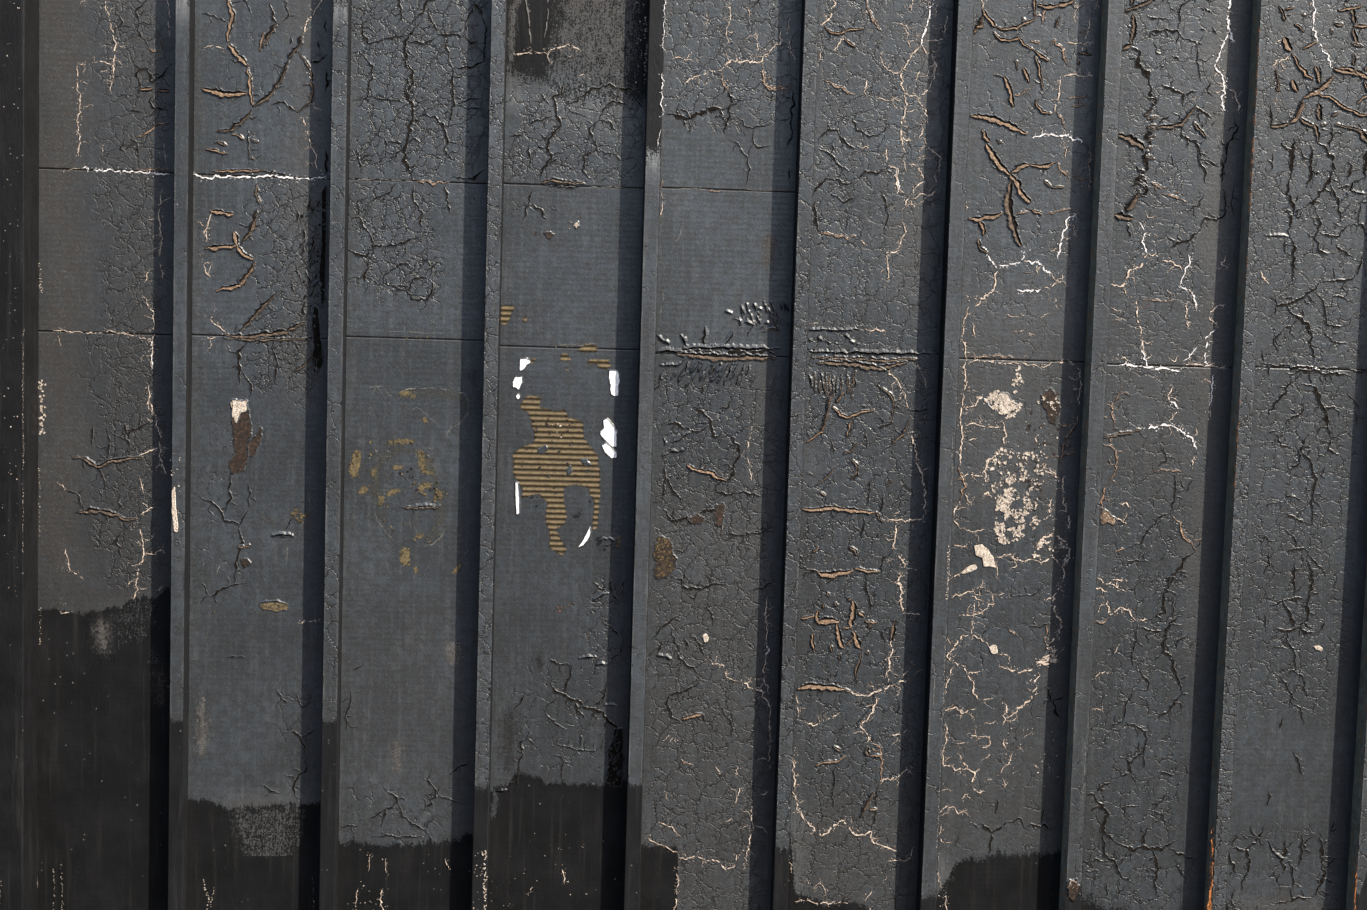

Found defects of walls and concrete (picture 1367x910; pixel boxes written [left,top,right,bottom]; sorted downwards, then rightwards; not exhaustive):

crack [72,0,171,161]
crack [202,0,949,302]
crack [58,189,172,598]
peeling [228,398,263,475]
peeling [512,357,621,555]
spalling [552,343,621,397]
crack [342,0,1339,910]
crack [1255,122,1367,775]